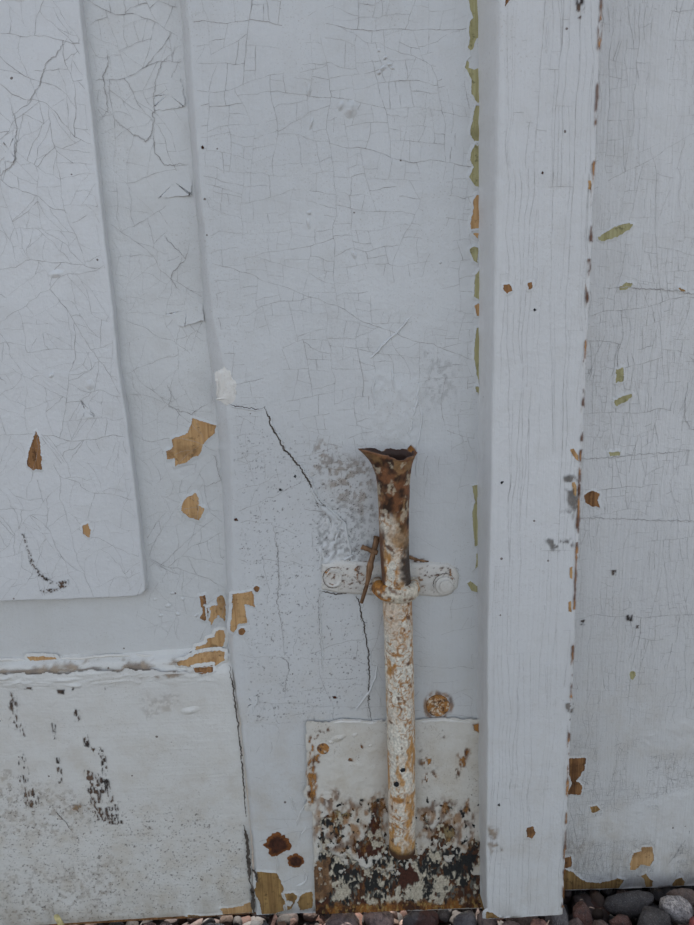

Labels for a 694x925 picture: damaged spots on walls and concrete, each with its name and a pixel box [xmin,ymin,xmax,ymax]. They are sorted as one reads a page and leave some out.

peeling [462,0,480,396]
peeling [24,428,45,473]
peeling [163,416,218,469]
crack [0,0,475,917]
peeling [174,584,262,677]
peeling [567,755,588,797]
rust [263,729,482,914]
peeling [184,869,315,917]
peeling [563,844,655,890]